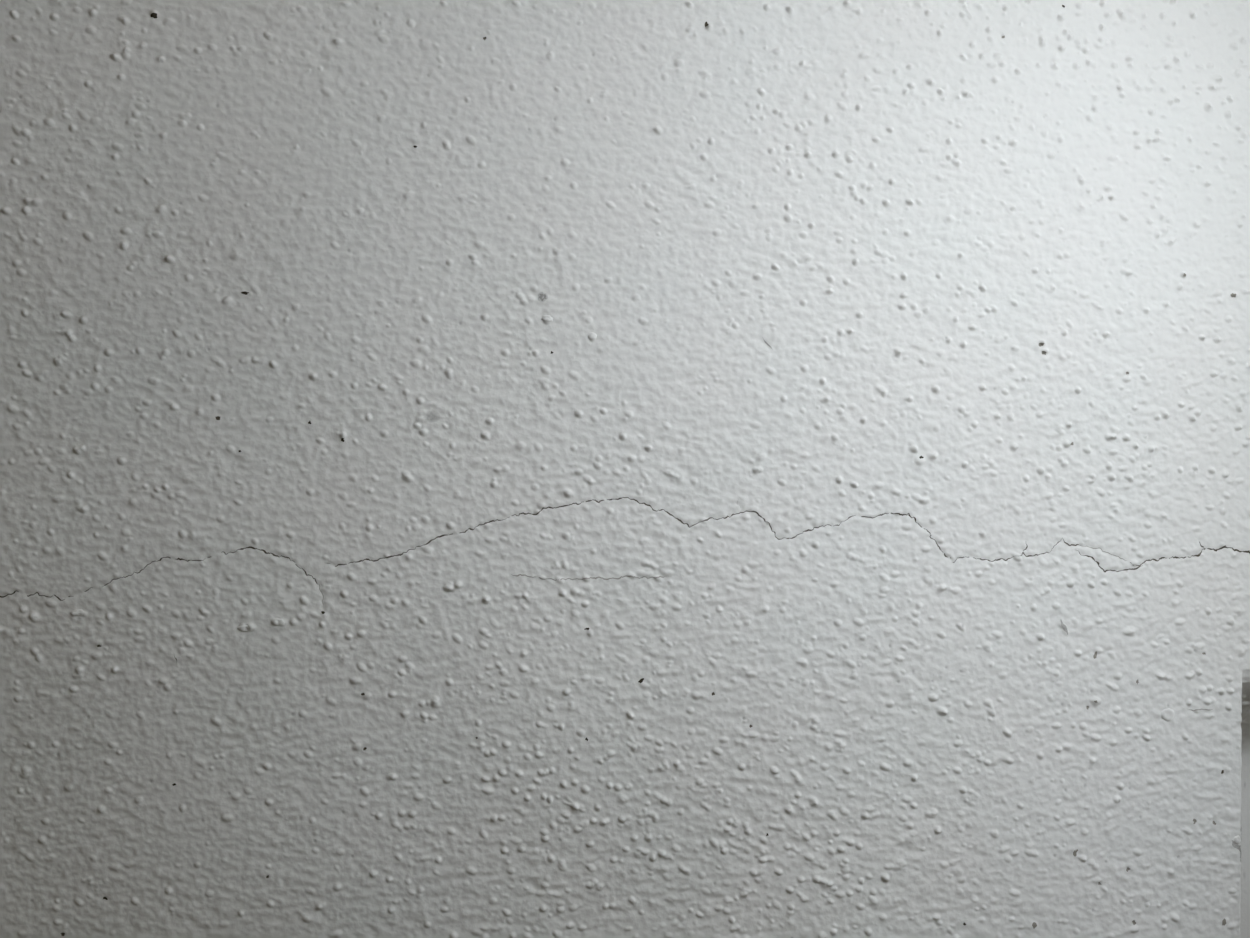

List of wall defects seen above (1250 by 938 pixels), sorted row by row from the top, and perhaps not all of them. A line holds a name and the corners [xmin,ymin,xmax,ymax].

crack [0,497,1250,603]